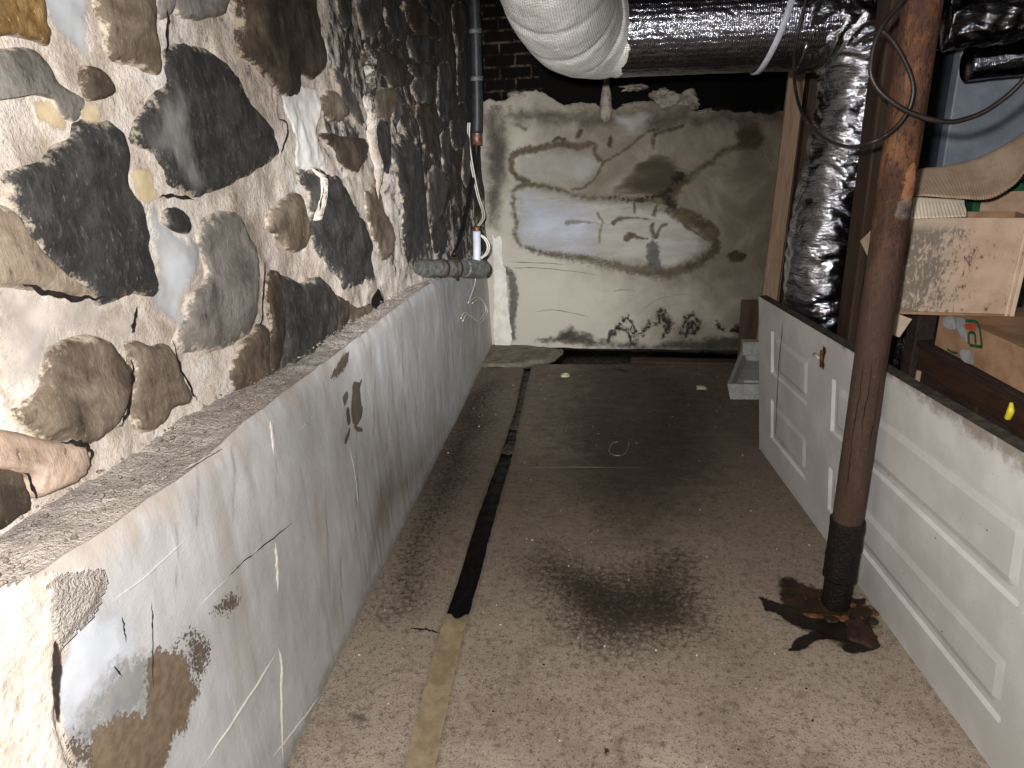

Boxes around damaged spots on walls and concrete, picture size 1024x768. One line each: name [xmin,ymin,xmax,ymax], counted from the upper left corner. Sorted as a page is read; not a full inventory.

water stain [488,113,763,278]
peeling [331,351,350,379]
water stain [541,308,739,352]
crack [229,523,292,576]
water stain [526,553,705,652]
rust [759,576,876,654]
flaking render [0,565,212,768]